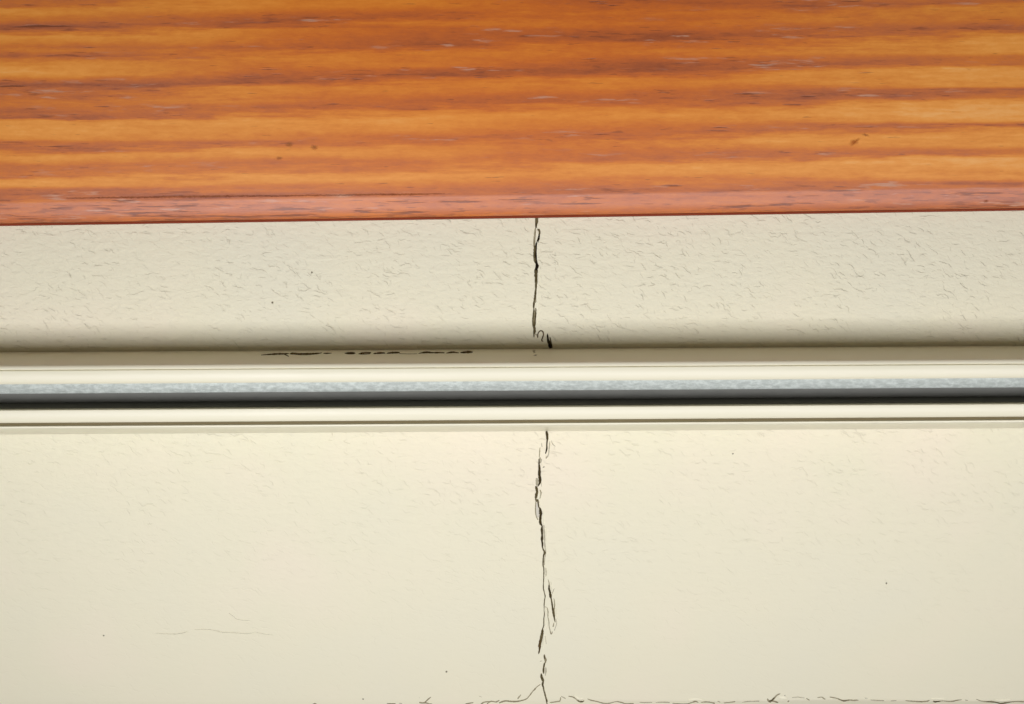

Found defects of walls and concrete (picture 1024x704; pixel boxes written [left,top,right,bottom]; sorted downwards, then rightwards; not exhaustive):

crack [532,218,553,348]
crack [466,431,1024,704]